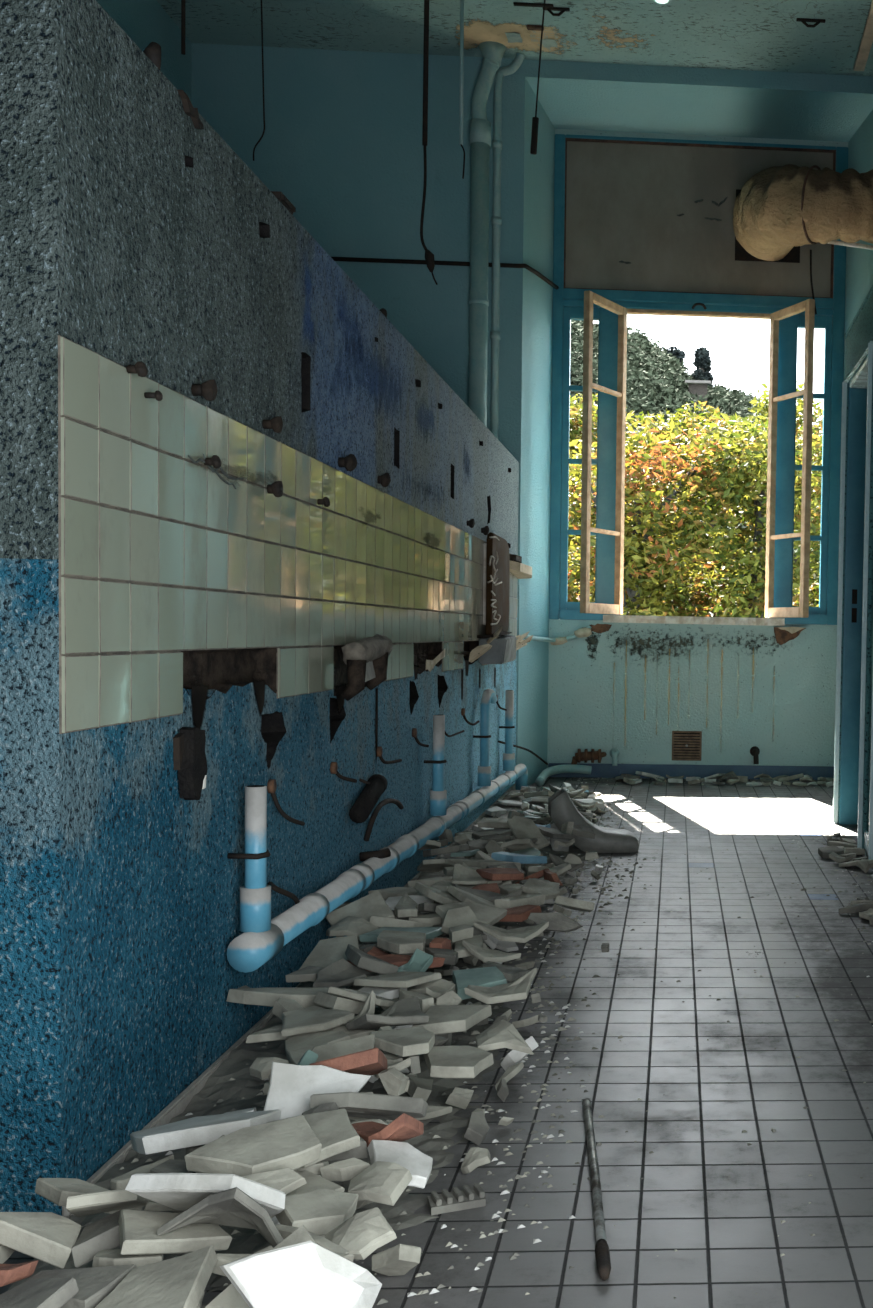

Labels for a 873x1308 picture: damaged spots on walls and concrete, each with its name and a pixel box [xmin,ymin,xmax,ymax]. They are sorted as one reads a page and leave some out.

peeling [455,8,655,55]
spalling [181,648,287,768]
spalling [329,645,348,743]
spalling [409,642,448,714]
spalling [463,641,479,676]
water stain [607,624,793,666]